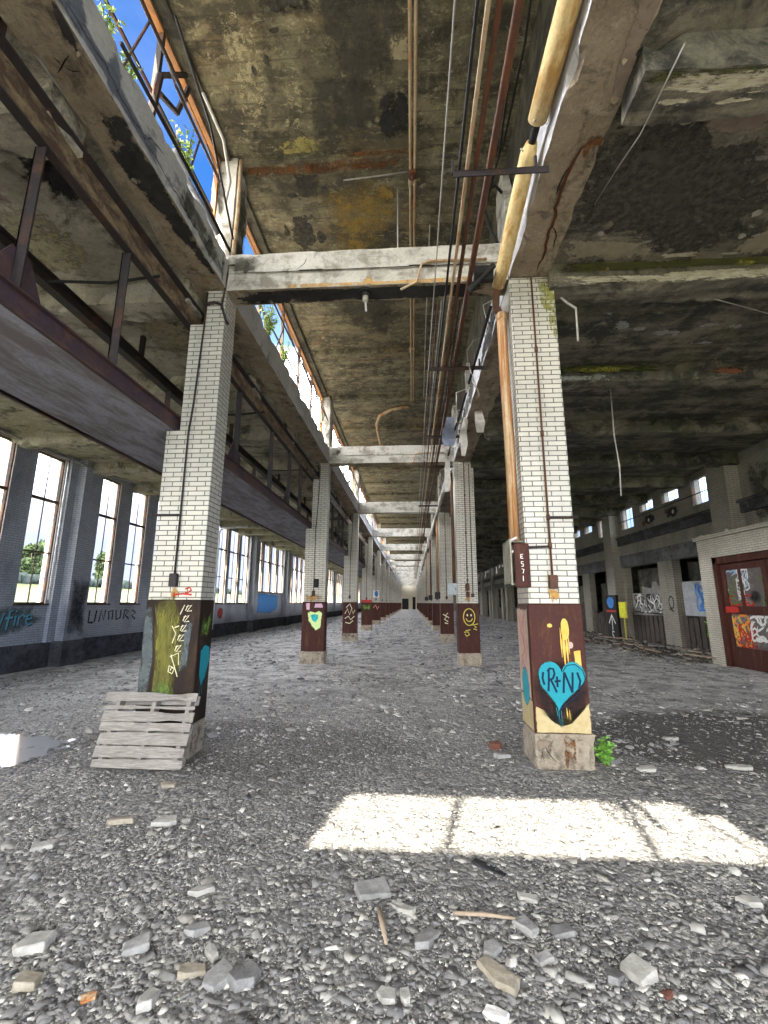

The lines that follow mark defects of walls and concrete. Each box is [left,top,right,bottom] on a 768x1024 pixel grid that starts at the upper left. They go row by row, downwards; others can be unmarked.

damp [279,0,409,155]
spalling [609,0,661,111]
damp [178,172,255,279]
rust [245,149,407,178]
damp [325,182,396,250]
crack [537,138,600,270]
damp [552,252,768,285]
peeling [560,121,768,261]